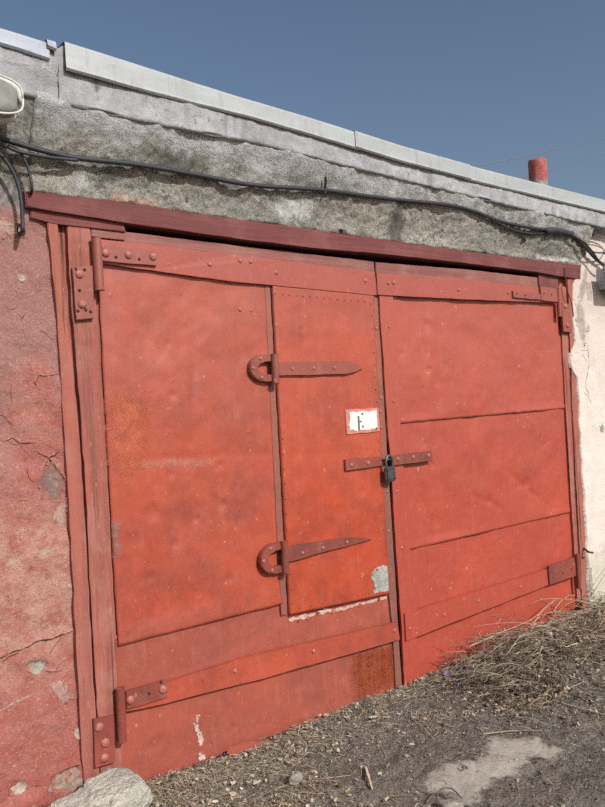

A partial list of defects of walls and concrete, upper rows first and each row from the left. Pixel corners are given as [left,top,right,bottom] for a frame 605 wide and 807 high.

crack [54,64,62,100]
leakage [275,195,314,221]
crack [33,374,59,391]
crack [582,346,592,404]
crack [0,386,66,489]
peeling [289,565,389,623]
crack [0,628,74,674]
spalling [27,660,50,675]
corrosion [352,648,394,695]
peeling [193,715,206,762]
spalling [7,780,27,797]
spalling [48,766,83,796]